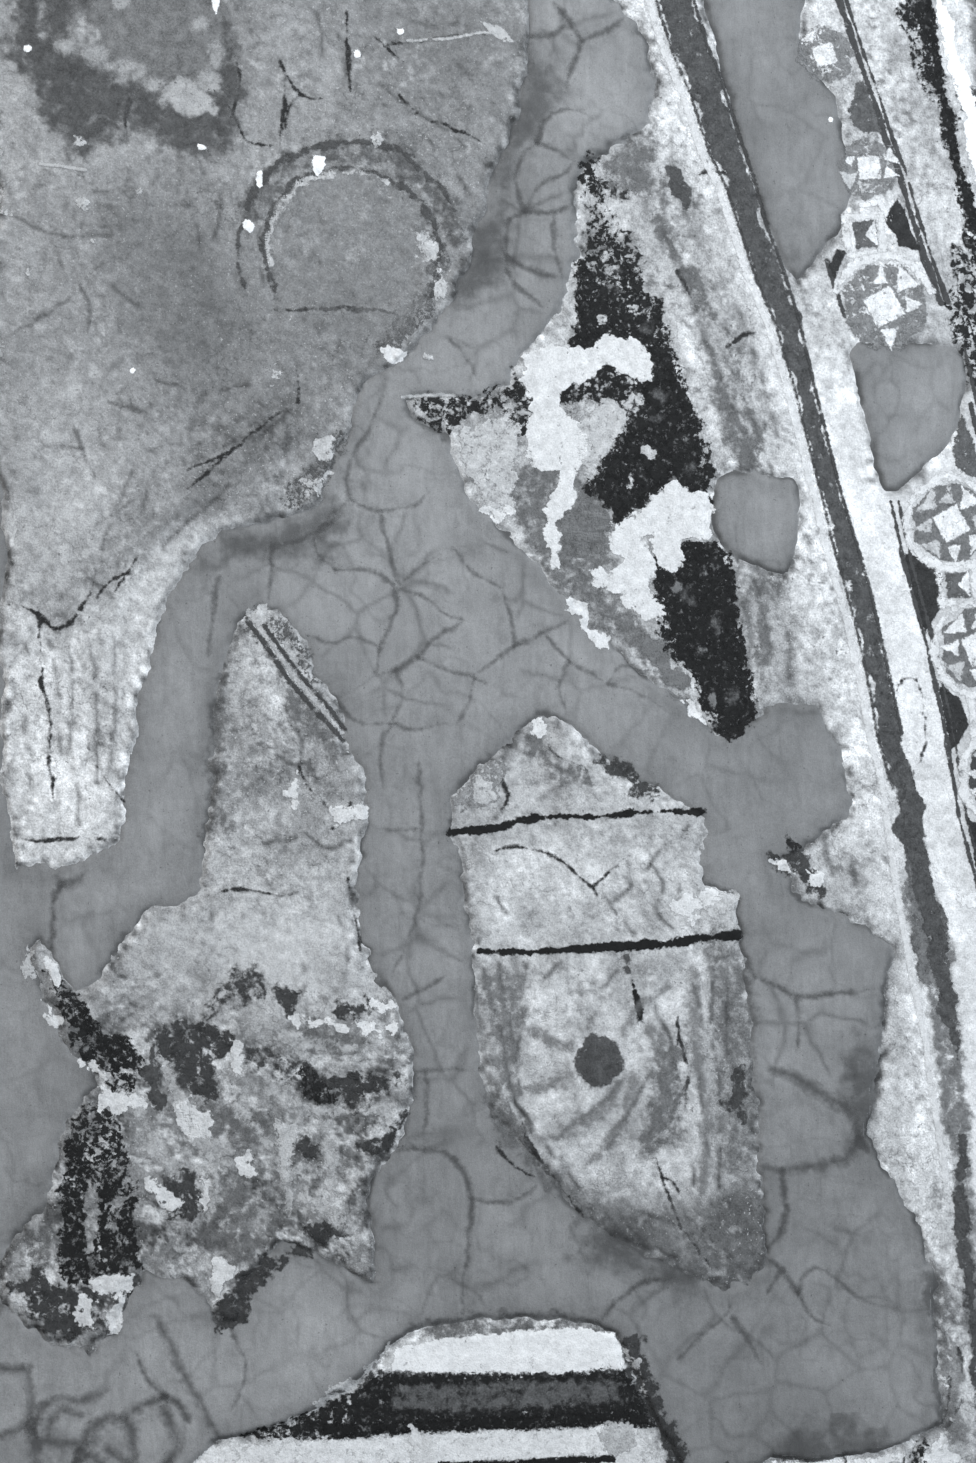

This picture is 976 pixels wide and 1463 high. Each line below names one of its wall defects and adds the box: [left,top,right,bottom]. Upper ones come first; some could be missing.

crack [228,12,487,146]
spalling [704,0,851,280]
crack [188,370,300,486]
spalling [849,288,976,491]
spalling [711,470,800,574]
crack [9,558,137,795]
crack [28,835,105,843]
crack [501,779,510,809]
crack [496,844,613,896]
peeling [136,1003,391,1148]
peeling [6,1226,99,1343]
peeling [144,1168,266,1298]